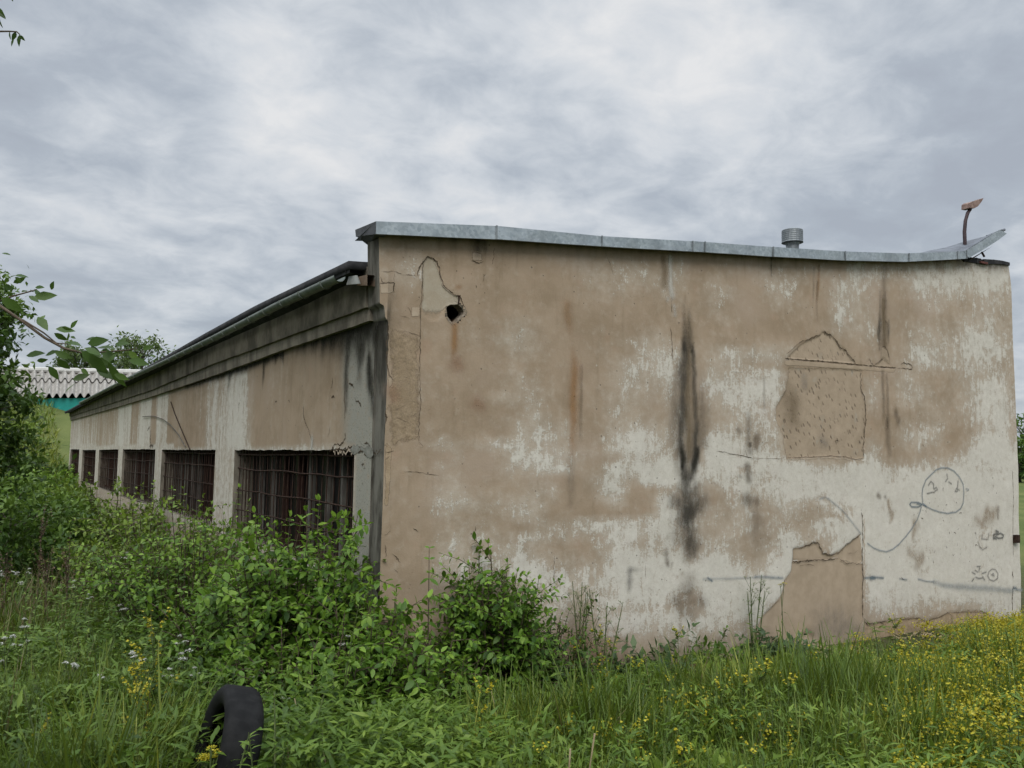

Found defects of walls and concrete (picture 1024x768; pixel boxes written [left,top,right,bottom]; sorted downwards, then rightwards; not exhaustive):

spalling [412,256,467,325]
water stain [303,310,388,405]
spalling [785,331,913,372]
water stain [678,337,700,550]
spalling [772,535,862,606]